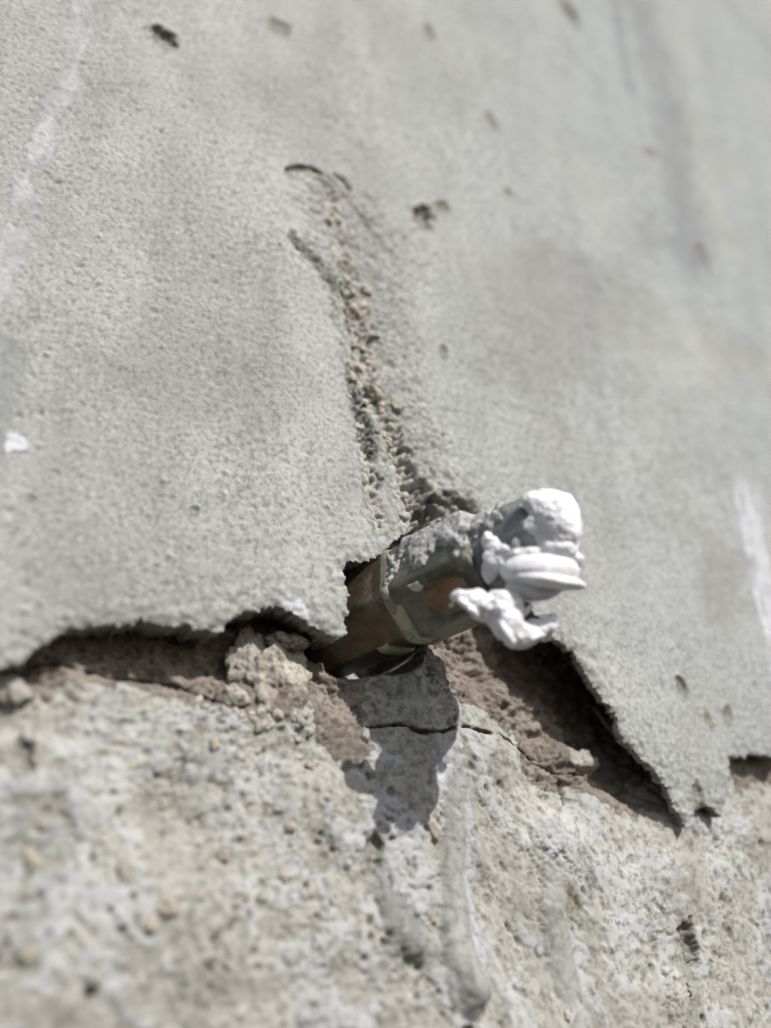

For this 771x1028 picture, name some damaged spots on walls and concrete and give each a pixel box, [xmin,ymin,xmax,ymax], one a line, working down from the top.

crack [284,164,386,252]
crack [22,662,214,702]
spalling [676,675,689,698]
spalling [0,605,686,827]
spalling [704,704,733,727]
crack [362,722,584,805]
spalling [729,754,771,791]
spalling [692,780,722,818]
hole [365,821,383,874]
hole [676,916,699,965]
spalling [82,986,95,1000]